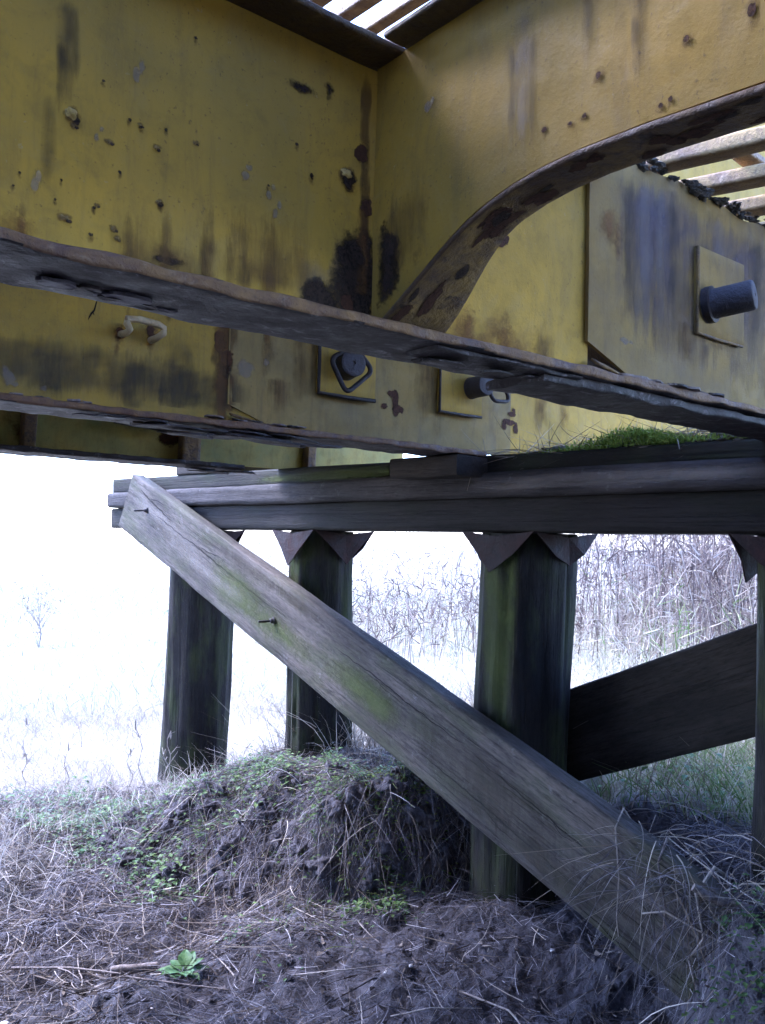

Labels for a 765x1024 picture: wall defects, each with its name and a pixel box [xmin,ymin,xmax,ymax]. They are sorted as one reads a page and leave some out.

rust [642,97,764,159]
rust [471,184,558,248]
rust [302,222,399,315]
rust [390,264,470,325]
rust [381,390,404,417]
rust [502,408,518,434]